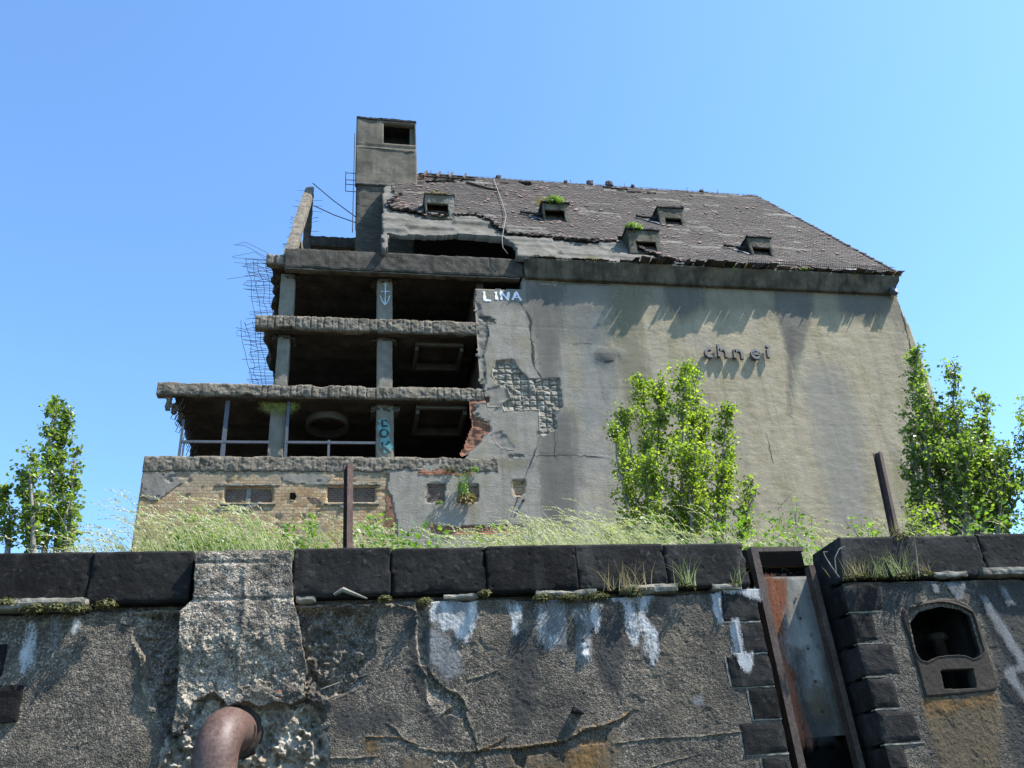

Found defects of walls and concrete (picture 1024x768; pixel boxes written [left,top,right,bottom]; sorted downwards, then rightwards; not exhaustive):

spalling [460,302,563,459]
crack [520,302,542,378]
flaking render [141,471,185,500]
flaking render [281,474,332,504]
flaking render [384,495,395,528]
spalling [112,603,420,768]
crack [320,668,742,768]
water stain [509,600,566,725]
water stain [589,595,658,688]
rust [765,576,831,745]
water stain [878,581,1024,768]